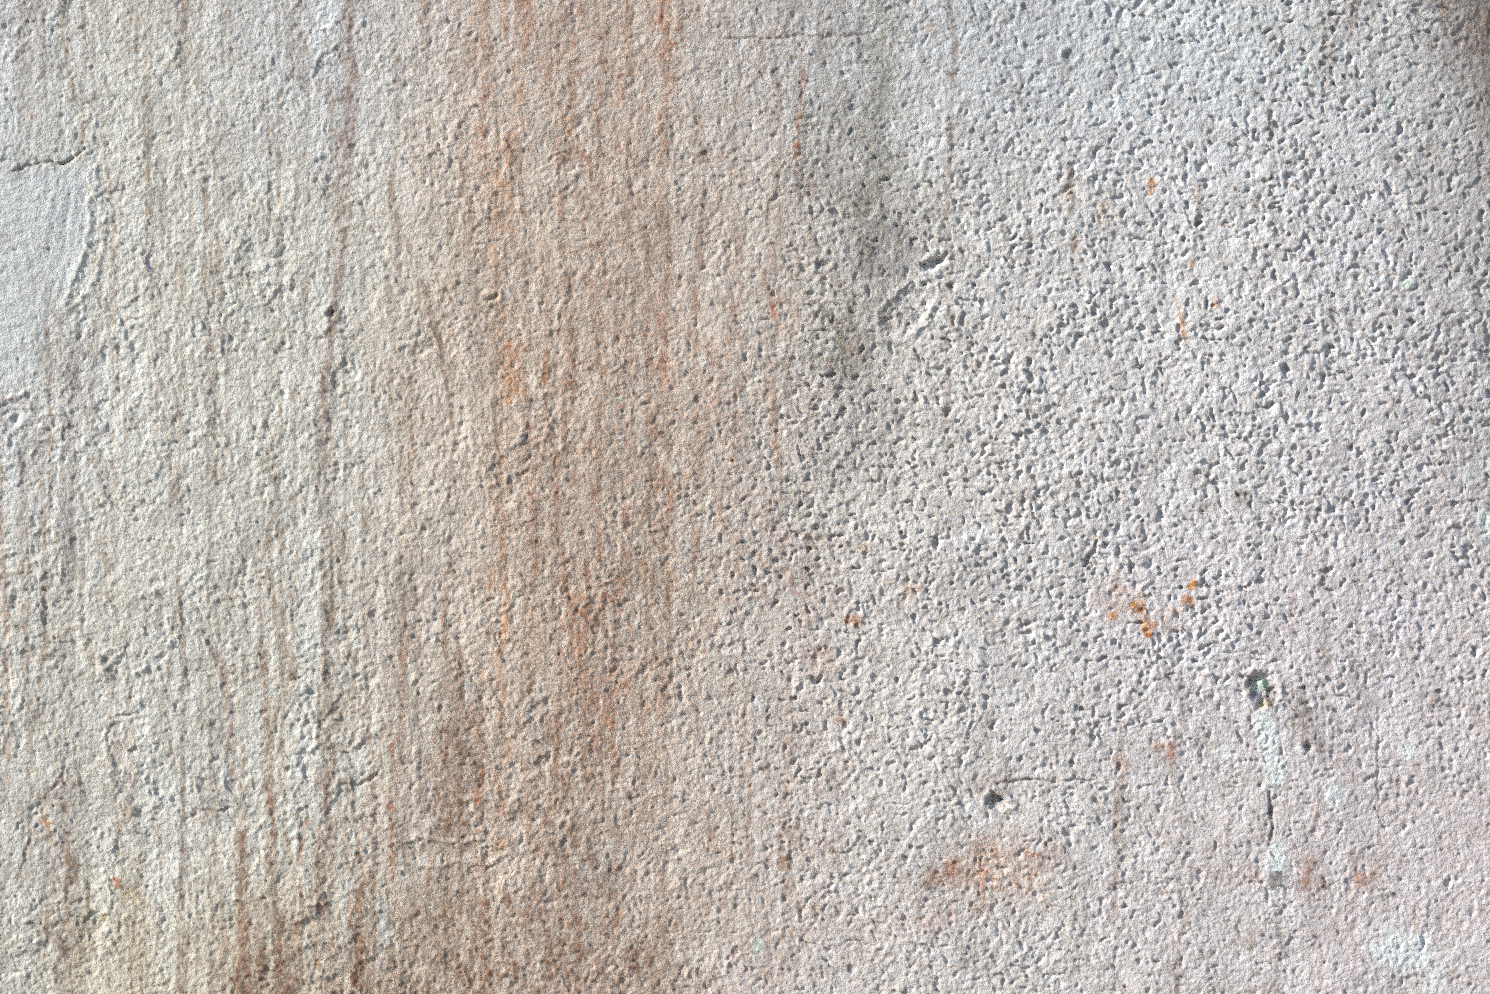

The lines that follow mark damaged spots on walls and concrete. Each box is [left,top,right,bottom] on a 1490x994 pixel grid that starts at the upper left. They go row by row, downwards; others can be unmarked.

rust [1130,601,1153,637]